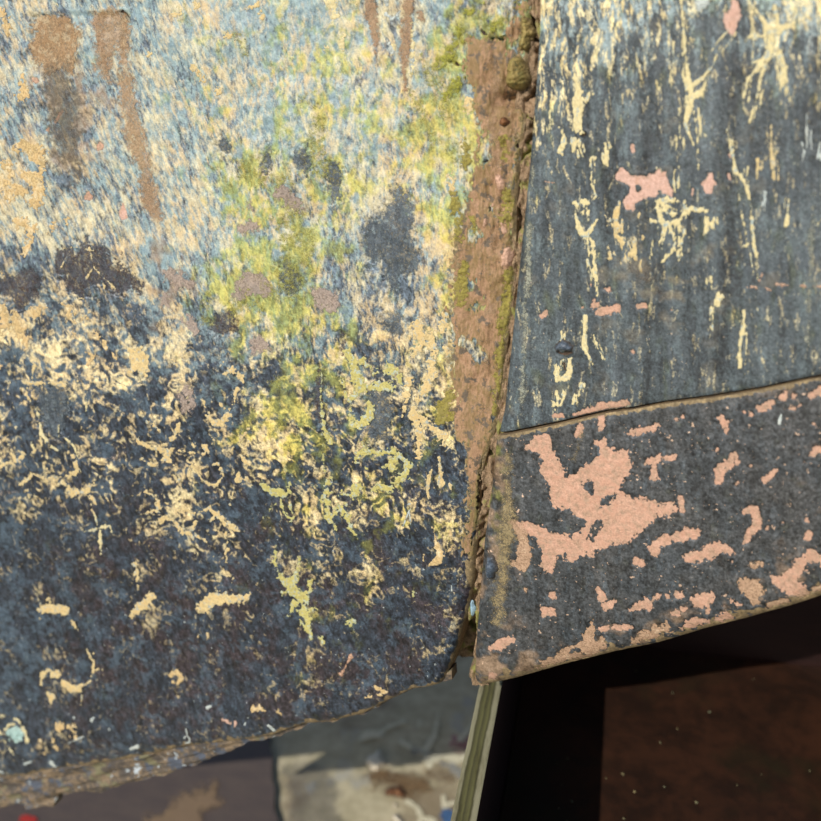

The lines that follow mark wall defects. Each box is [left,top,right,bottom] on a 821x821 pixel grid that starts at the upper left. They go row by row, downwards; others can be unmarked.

corrosion [28,5,163,221]
corrosion [364,0,380,54]
corrosion [398,0,425,91]
peeling [669,0,802,155]
peeling [557,72,719,365]
peeling [0,363,112,555]
peeling [136,411,224,492]
crack [475,462,483,509]
peeling [507,357,686,574]
peeling [193,577,251,619]
peeling [272,545,325,645]
peeling [536,518,821,670]